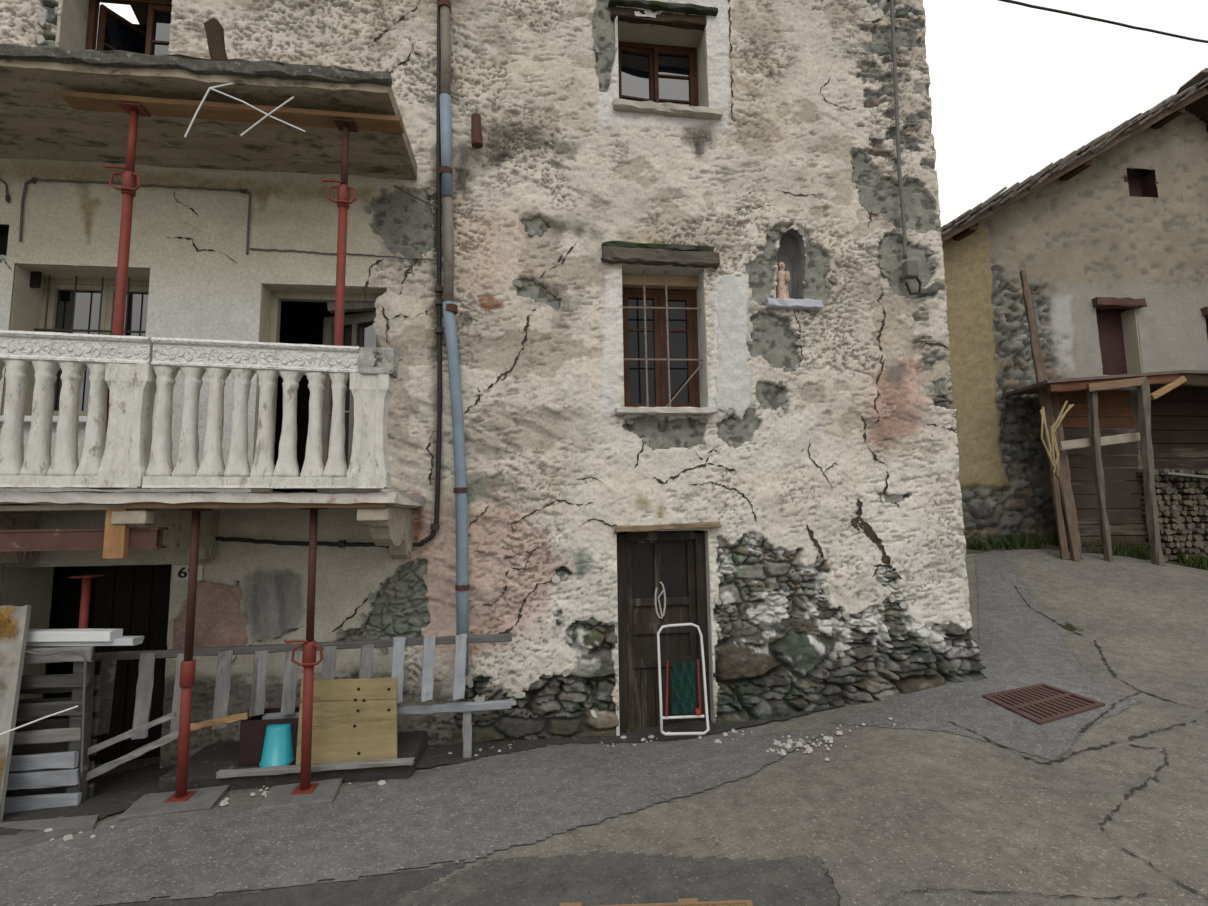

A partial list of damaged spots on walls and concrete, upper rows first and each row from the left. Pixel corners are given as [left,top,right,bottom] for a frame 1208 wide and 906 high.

flaking render [37,0,59,47]
flaking render [866,0,913,20]
flaking render [364,187,435,267]
flaking render [851,152,937,300]
crack [463,243,576,414]
flaking render [622,224,837,450]
flaking render [336,558,430,653]
crack [468,477,622,634]
crack [635,444,757,522]
crack [806,524,824,599]
flaking render [713,531,988,725]
crack [808,286,902,579]